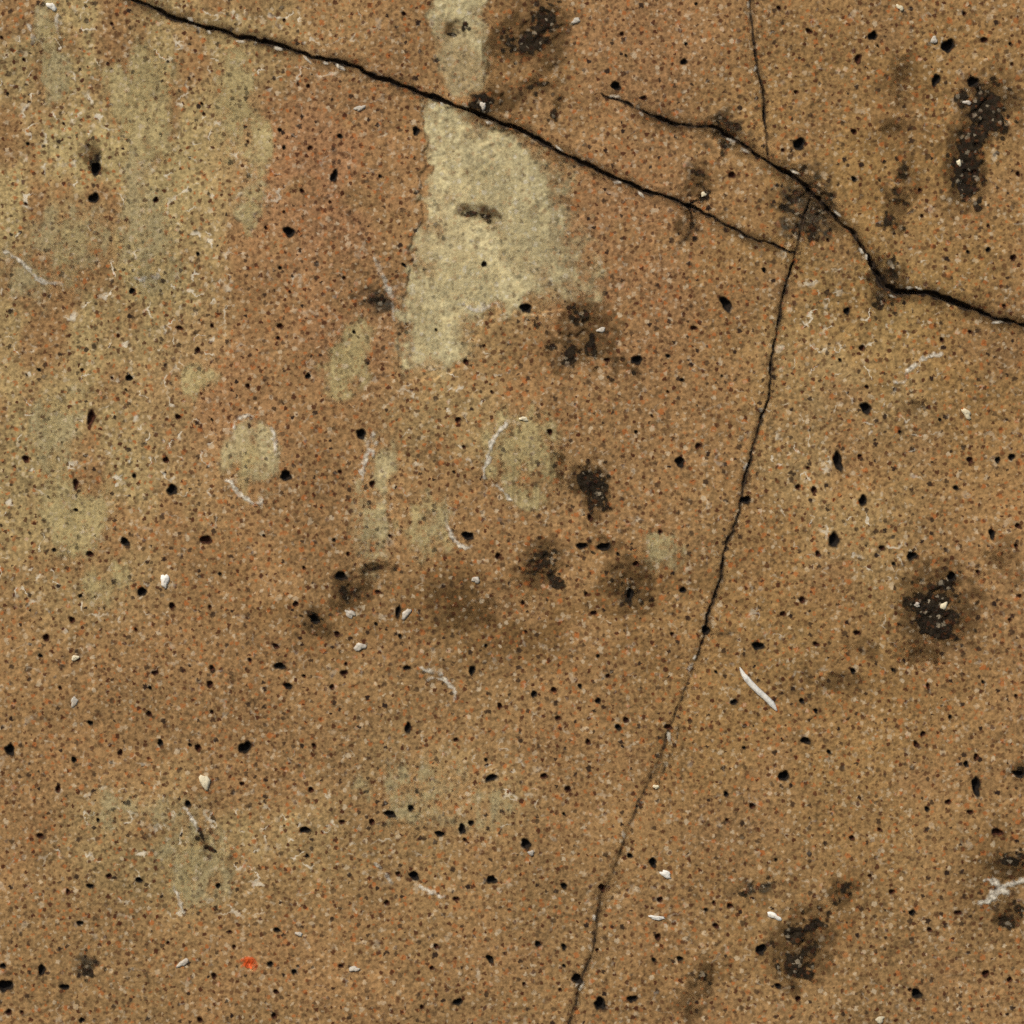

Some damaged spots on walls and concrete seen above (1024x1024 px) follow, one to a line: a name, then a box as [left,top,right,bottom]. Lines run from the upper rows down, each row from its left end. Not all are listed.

crack [124,0,1024,659]
crack [629,686,686,824]
crack [567,850,621,1024]